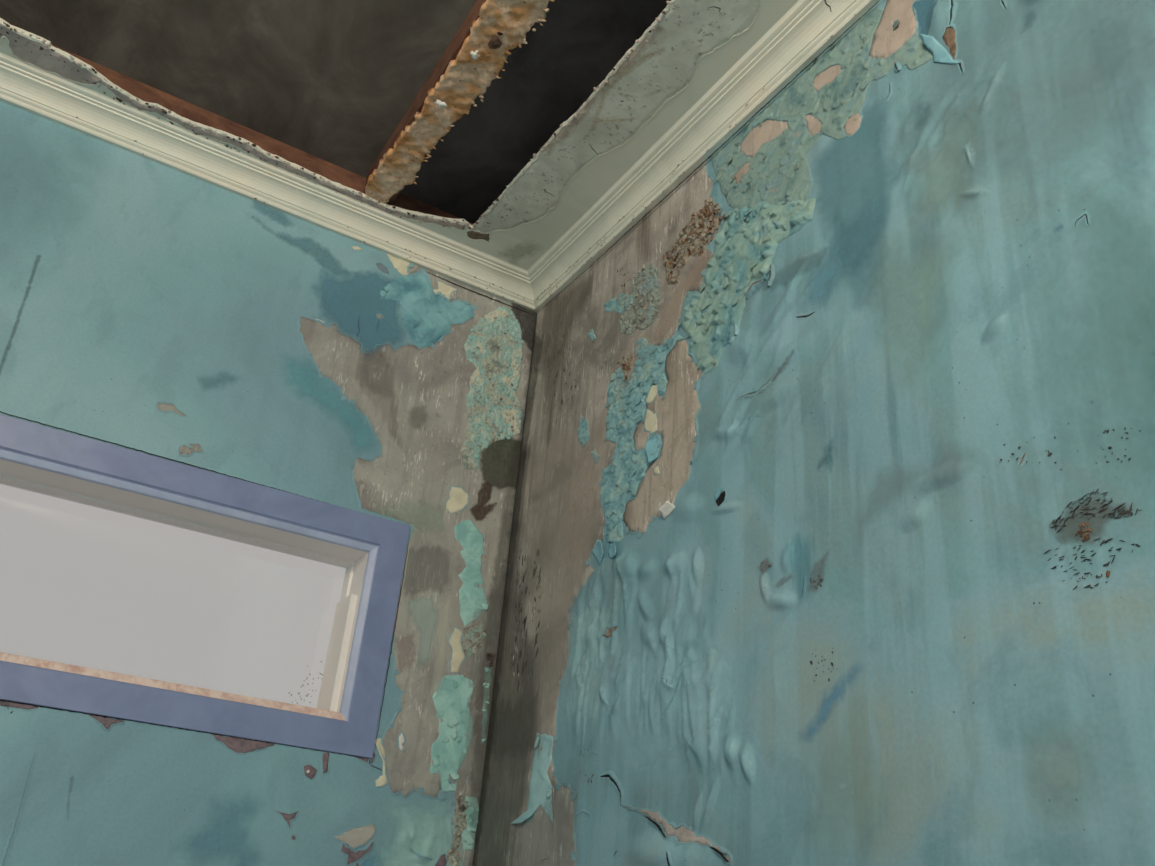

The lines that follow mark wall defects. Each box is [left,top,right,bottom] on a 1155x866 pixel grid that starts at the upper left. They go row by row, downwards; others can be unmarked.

peeling [0,0,763,243]
peeling [734,119,788,185]
peeling [805,114,822,136]
peeling [812,64,844,92]
damp [512,294,576,424]
peeling [297,150,722,866]